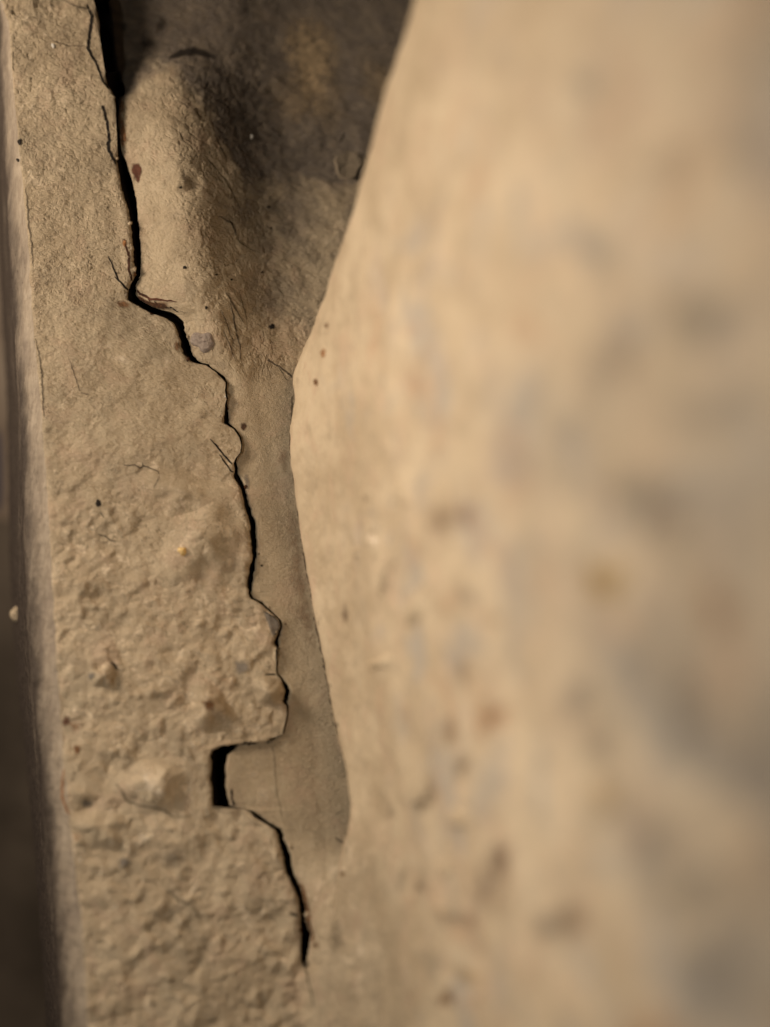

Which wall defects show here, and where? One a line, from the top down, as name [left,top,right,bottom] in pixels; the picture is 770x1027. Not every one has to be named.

crack [86,0,314,1006]